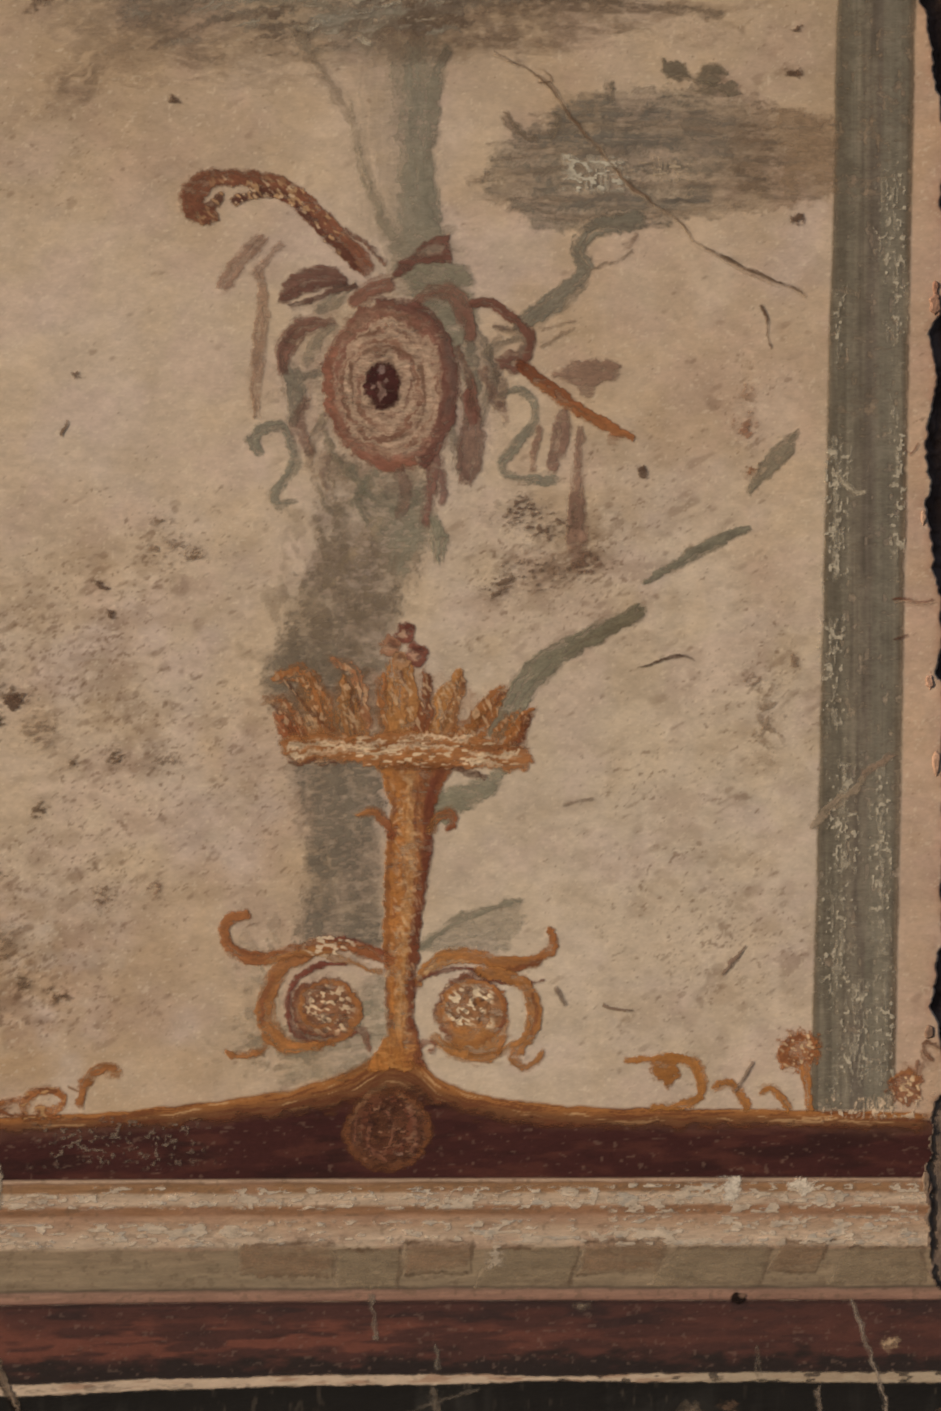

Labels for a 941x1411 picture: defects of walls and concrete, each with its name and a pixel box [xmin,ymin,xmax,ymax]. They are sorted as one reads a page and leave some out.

spalling [920,0,941,95]
peeling [564,155,687,191]
crack [510,61,803,349]
peeling [876,174,906,336]
peeling [824,440,850,575]
peeling [890,413,906,554]
spalling [921,281,941,594]
spalling [5,694,22,711]
peeling [819,619,845,725]
spalling [925,653,941,690]
peeling [0,764,941,1290]
crack [0,1365,20,1411]